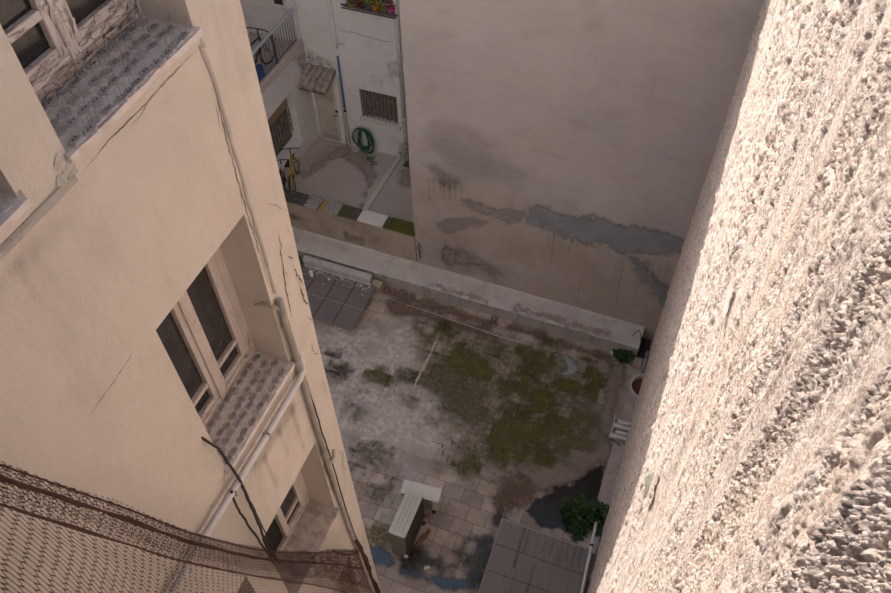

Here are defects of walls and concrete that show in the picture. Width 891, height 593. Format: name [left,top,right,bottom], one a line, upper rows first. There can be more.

crack [216,95,312,321]
leakage [437,200,524,233]